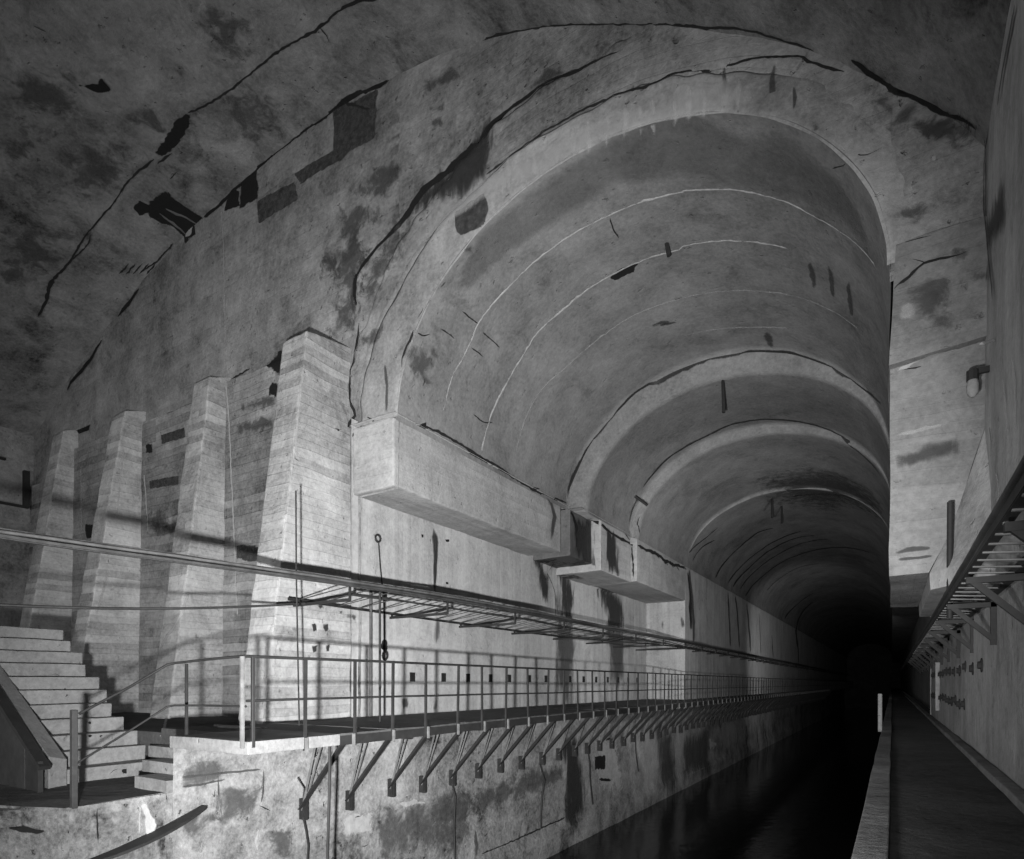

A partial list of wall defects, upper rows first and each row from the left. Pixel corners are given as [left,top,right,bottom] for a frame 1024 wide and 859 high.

spalling [79,79,110,93]
crack [38,159,154,316]
spalling [119,172,203,274]
spalling [155,114,190,163]
crack [188,0,376,113]
crack [204,80,389,217]
peeling [224,90,378,223]
peeling [455,194,488,235]
crack [335,51,619,437]
crack [485,23,844,174]
leakage [535,560,579,702]
leakage [597,588,623,683]